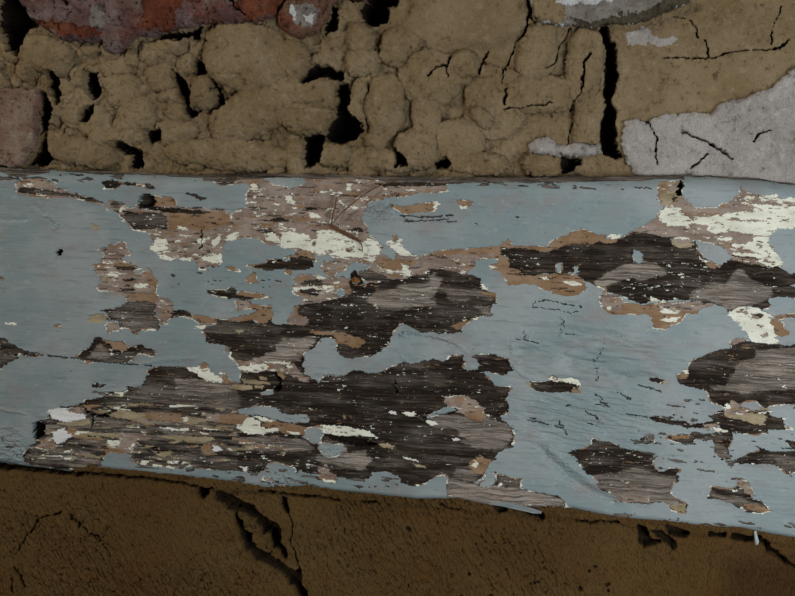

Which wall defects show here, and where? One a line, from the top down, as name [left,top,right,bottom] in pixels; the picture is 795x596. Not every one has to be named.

crack [502,0,551,110]
crack [568,53,592,145]
crack [645,121,659,164]
crack [675,132,734,196]
crack [668,7,789,60]
peeling [0,170,795,550]
crack [0,462,340,596]